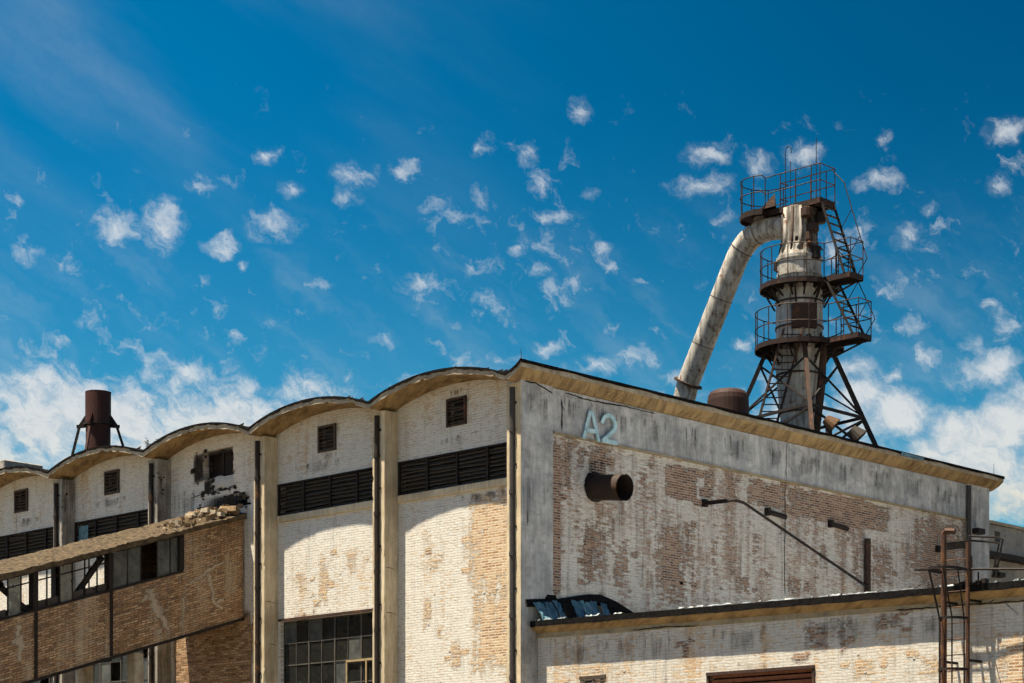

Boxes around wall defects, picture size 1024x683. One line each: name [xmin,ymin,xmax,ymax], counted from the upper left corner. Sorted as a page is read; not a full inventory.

spalling [190,449,254,509]
peeling [422,486,507,676]
peeling [553,438,638,596]
peeling [639,462,714,605]
peeling [731,570,757,593]
peeling [787,539,830,597]
peeling [728,477,897,588]
peeling [909,517,961,588]
peeling [675,636,695,658]
peeling [792,623,887,678]
peeling [904,650,951,674]
peeling [997,632,1024,683]